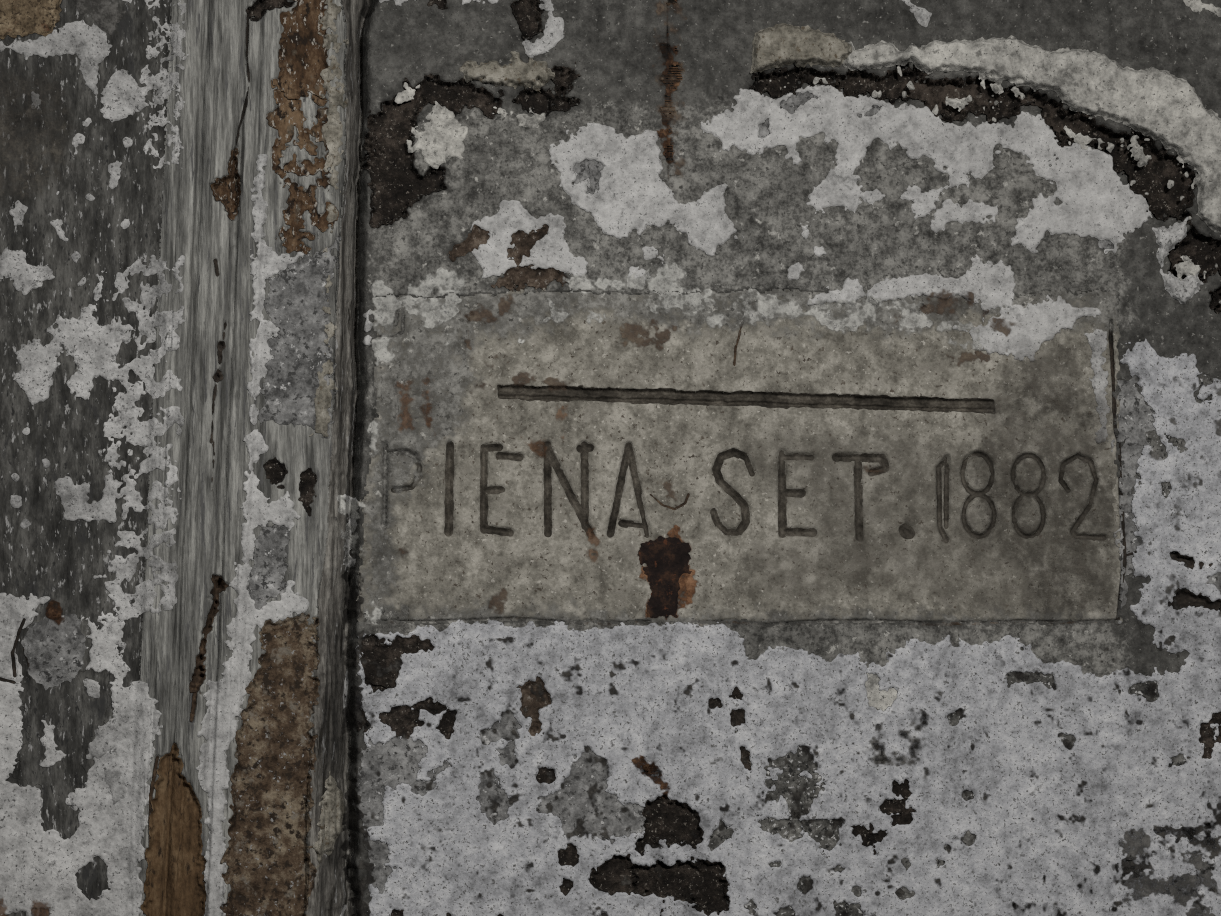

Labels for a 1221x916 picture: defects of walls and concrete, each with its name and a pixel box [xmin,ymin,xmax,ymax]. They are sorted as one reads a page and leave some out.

spalling [362,62,581,229]
peeling [427,0,565,58]
rust [653,0,685,175]
peeling [0,0,349,916]
peeling [337,494,366,573]
rust [638,525,697,619]
peeling [351,329,1221,916]